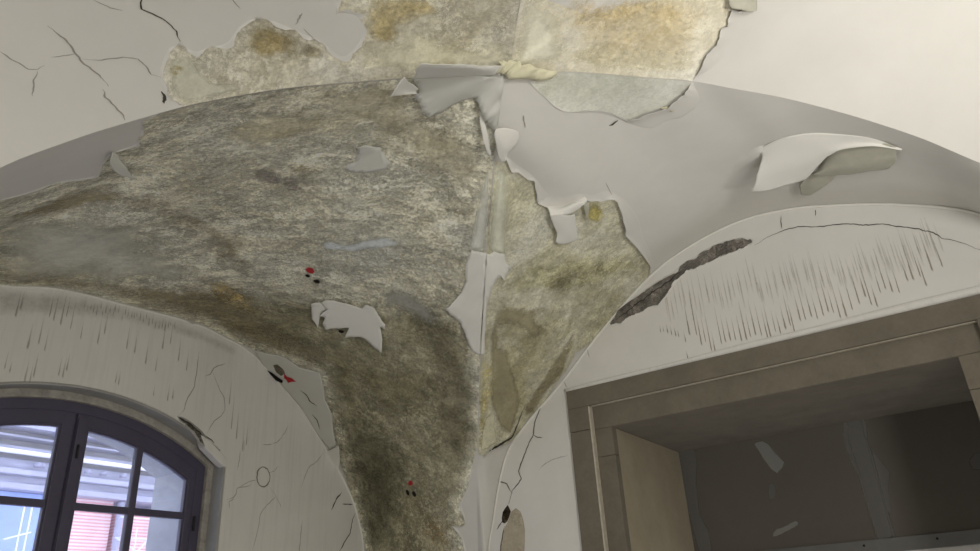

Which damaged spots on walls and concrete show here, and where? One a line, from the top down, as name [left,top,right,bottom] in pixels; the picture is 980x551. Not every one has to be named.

crack [140,0,180,40]
water stain [20,191,117,218]
flaking render [0,0,757,551]
water stain [123,282,469,551]
crack [497,408,542,551]
water stain [479,309,570,441]